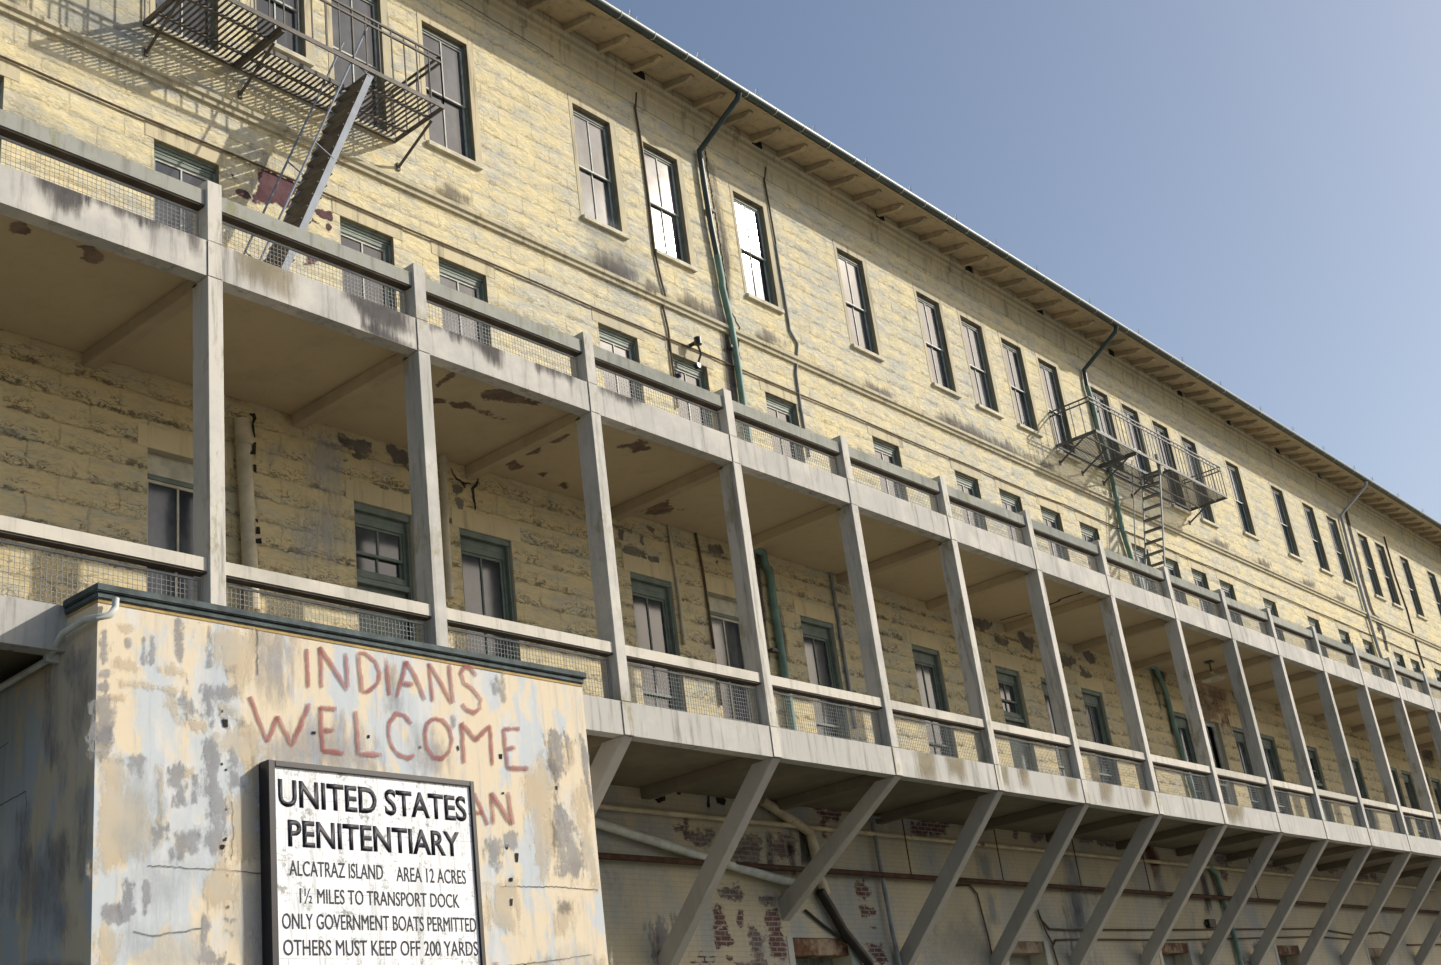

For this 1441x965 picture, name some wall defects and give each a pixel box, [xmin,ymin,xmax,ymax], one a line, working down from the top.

spalling [9,222,31,235]
water stain [39,178,168,226]
peeling [231,168,297,209]
peeling [311,209,333,231]
spalling [76,245,104,264]
water stain [347,293,409,345]
spalling [433,372,541,421]
peeling [673,818,716,847]
peeling [731,831,799,863]
peeling [691,881,789,965]
peeling [855,879,888,965]